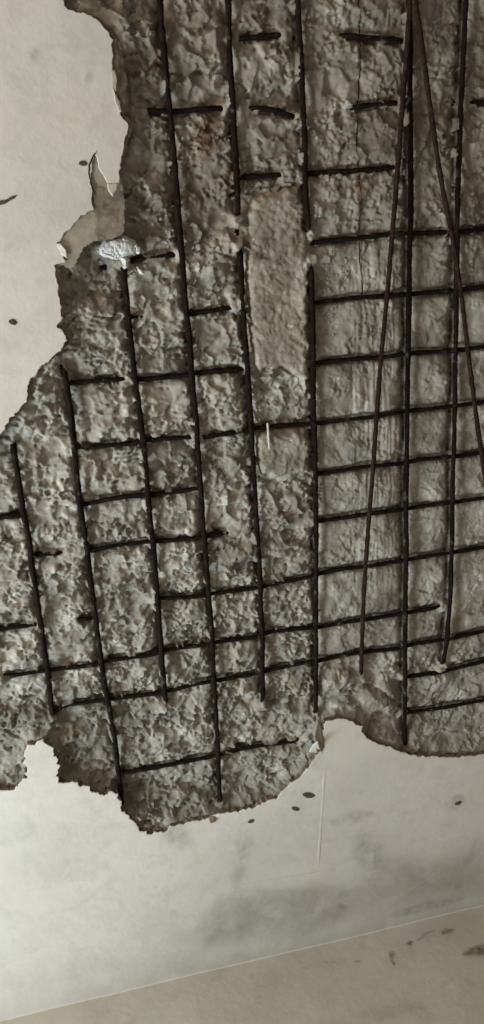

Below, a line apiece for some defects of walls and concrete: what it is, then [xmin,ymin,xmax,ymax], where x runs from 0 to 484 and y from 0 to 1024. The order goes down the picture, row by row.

spalling [56,0,484,802]